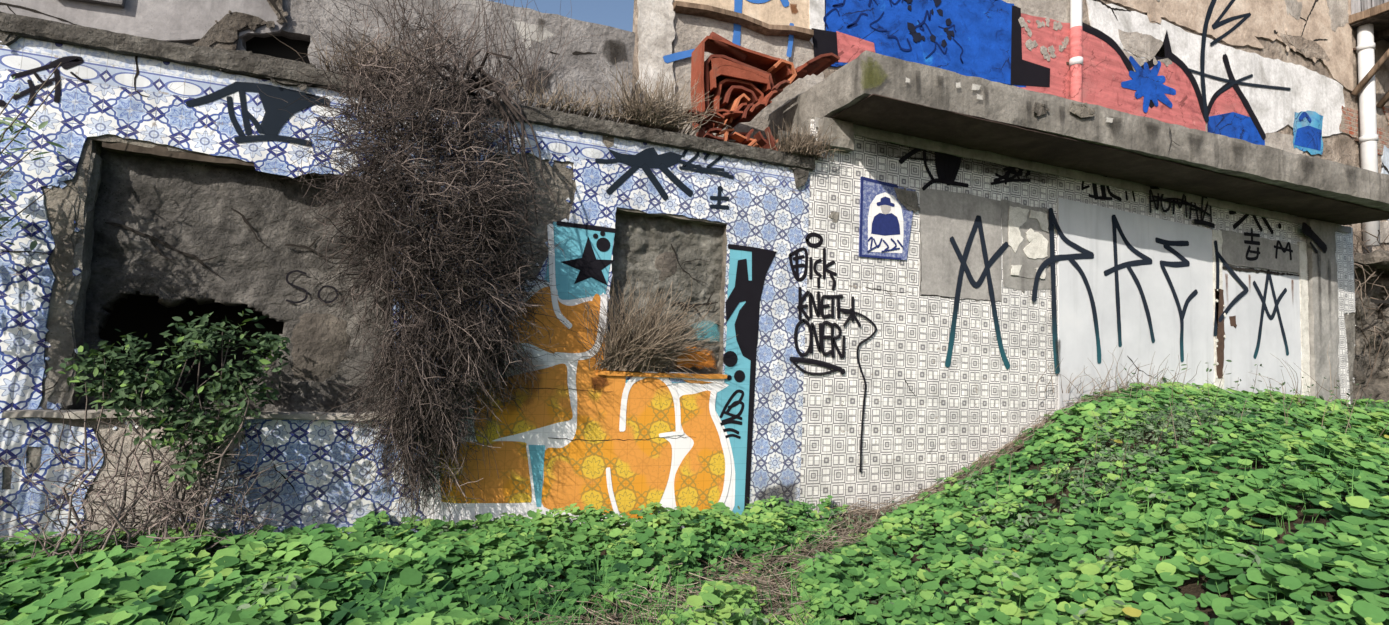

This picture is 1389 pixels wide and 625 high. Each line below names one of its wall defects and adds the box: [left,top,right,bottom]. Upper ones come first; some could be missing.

flaking render [1118,0,1172,66]
flaking render [1277,27,1330,65]
peeling [38,181,82,410]